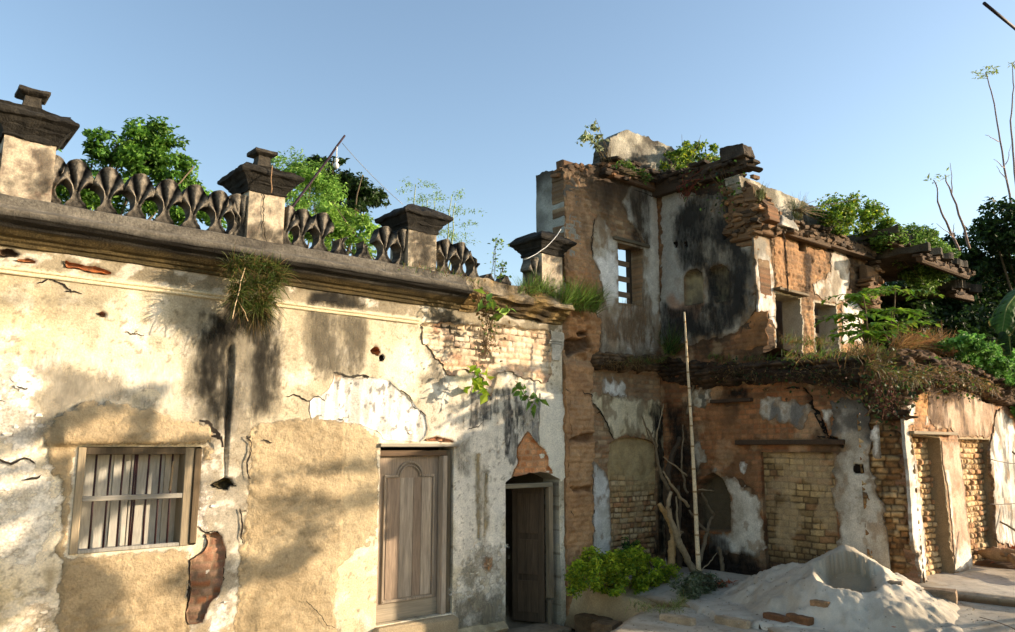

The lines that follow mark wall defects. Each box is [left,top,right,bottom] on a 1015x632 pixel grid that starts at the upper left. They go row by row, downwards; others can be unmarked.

crack [37,279,82,294]
damp [606,191,750,349]
damp [190,302,279,426]
flaking render [420,322,552,396]
flaking render [309,375,453,442]
crack [786,386,837,439]
crack [0,457,41,481]
crack [199,420,272,479]
flaking render [512,432,553,477]
flaking render [185,478,236,632]